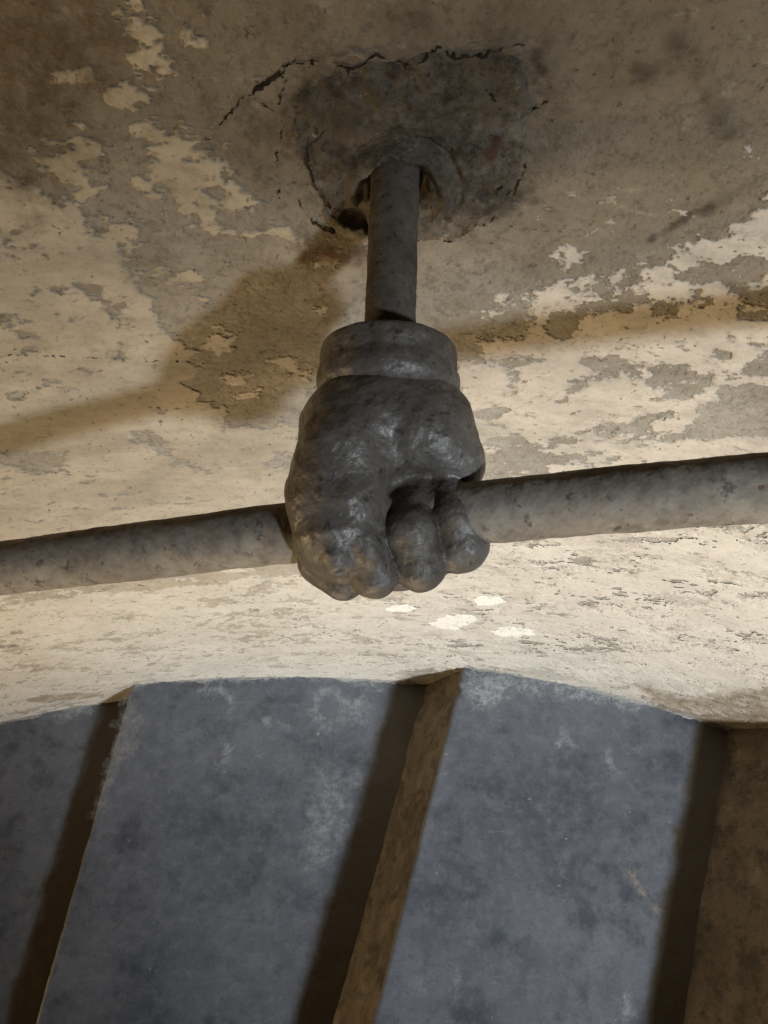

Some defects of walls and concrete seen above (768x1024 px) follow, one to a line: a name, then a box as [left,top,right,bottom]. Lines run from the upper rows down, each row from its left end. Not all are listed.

peeling [0,0,343,541]
crack [191,38,524,236]
crack [417,163,582,268]
peeling [448,194,768,480]